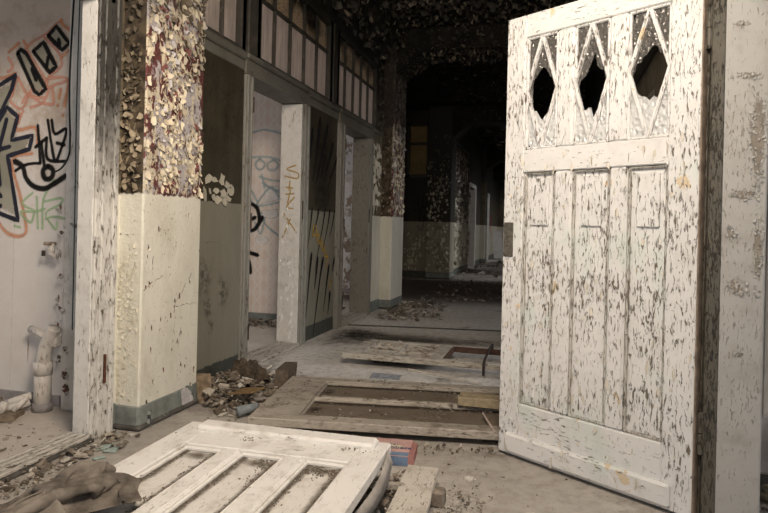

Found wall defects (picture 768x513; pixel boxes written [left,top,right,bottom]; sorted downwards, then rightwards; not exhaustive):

peeling [119,0,234,206]
peeling [323,0,578,104]
peeling [475,119,520,159]
peeling [725,69,768,474]